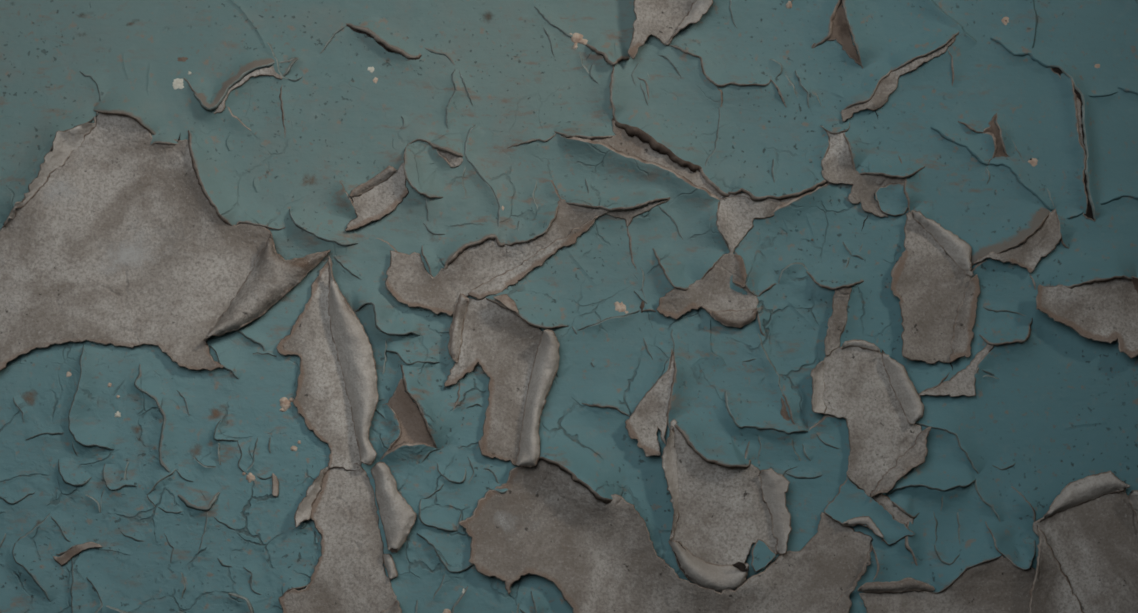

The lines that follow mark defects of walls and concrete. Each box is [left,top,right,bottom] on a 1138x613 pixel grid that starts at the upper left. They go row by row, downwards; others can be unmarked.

crack [0,344,274,613]
peeling [0,82,331,371]
crack [209,325,277,379]
peeling [276,0,1138,613]
crack [931,30,1138,222]